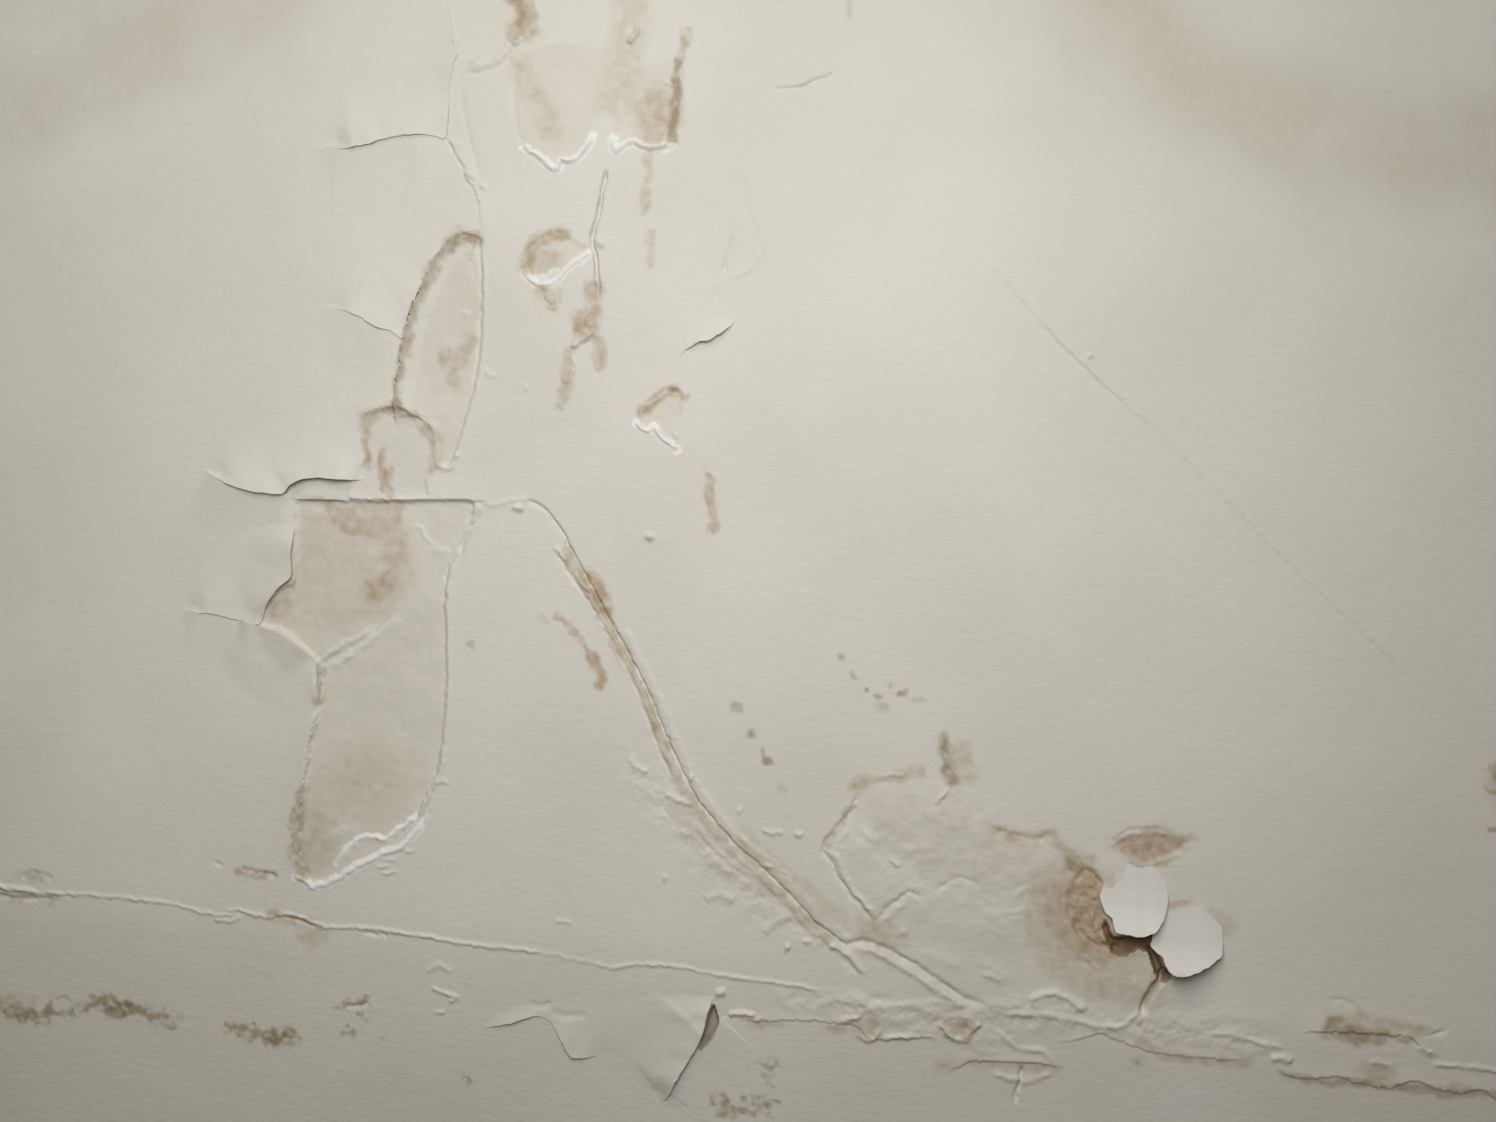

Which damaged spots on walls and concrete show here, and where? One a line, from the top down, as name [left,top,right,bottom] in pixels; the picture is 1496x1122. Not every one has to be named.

peeling [183,231,508,893]
crack [0,492,996,1018]
spalling [481,823,1496,1117]
crack [1142,1000,1301,1068]
crack [1425,1059,1496,1076]